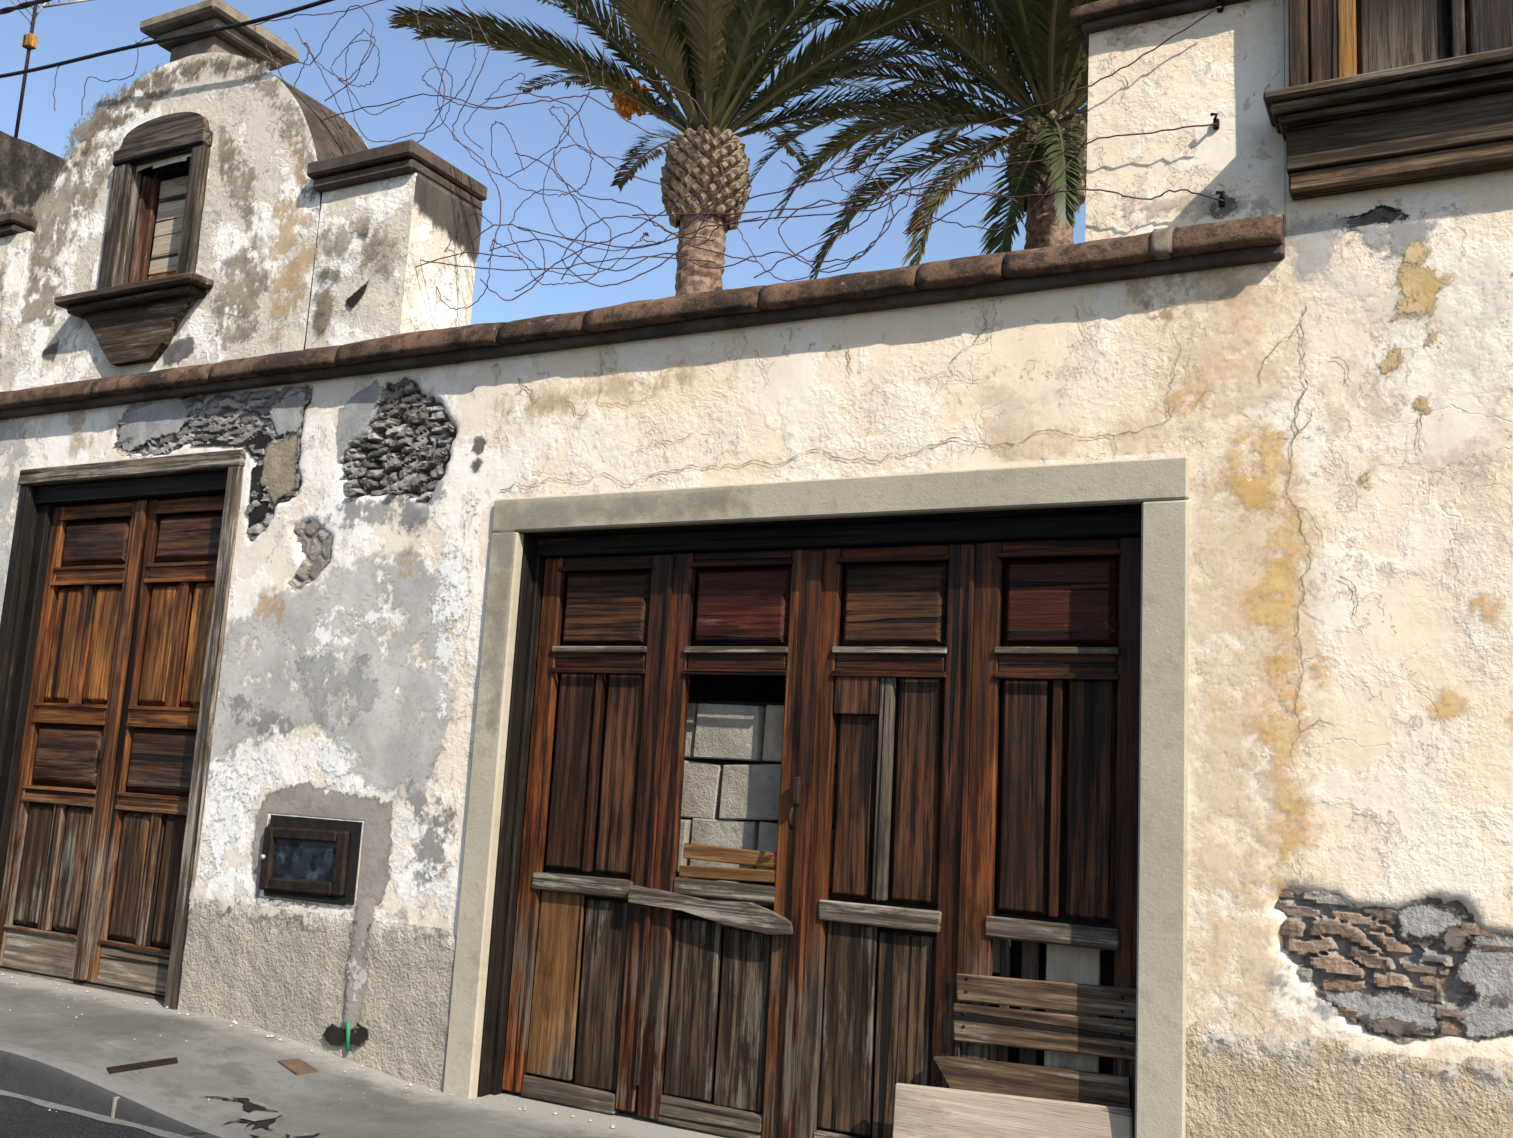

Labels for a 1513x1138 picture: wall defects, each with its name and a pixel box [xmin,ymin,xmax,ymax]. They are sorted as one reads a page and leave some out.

spalling [162,336,195,365]
peeling [0,419,31,617]
peeling [113,377,482,919]
spalling [470,435,486,472]
crack [501,306,1372,798]
leakage [1189,459,1507,1086]
spalling [1267,889,1513,1044]